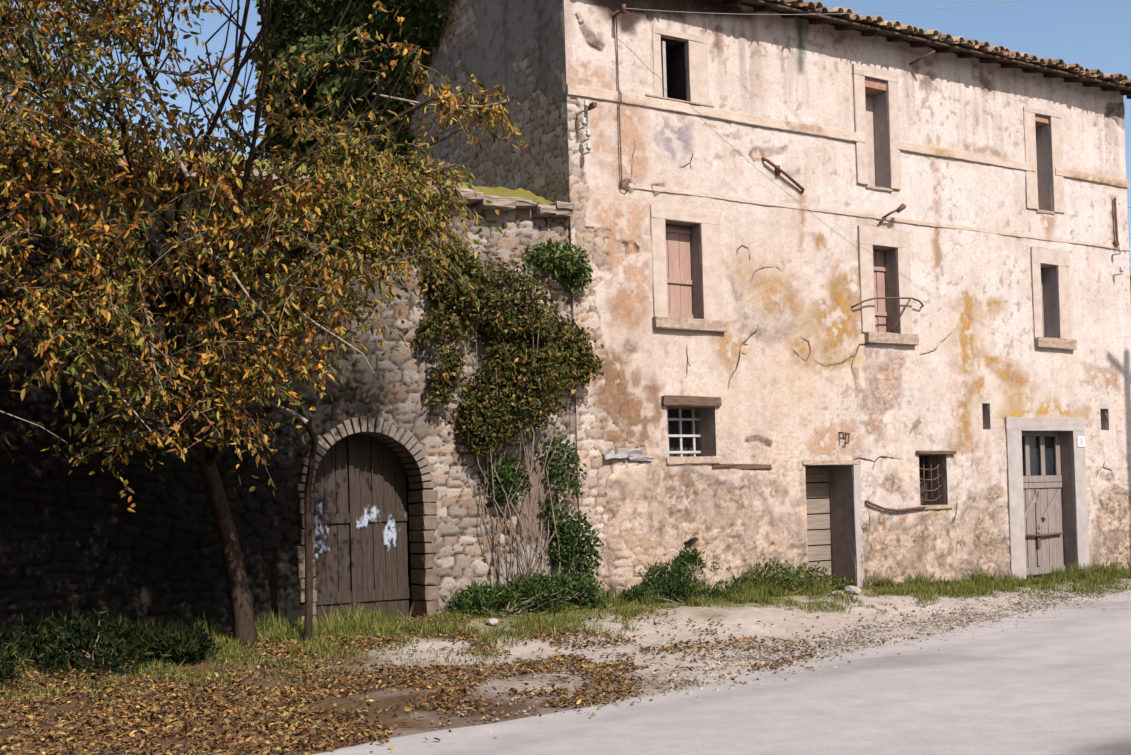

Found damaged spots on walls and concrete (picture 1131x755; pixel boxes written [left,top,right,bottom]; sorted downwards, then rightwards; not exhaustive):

crack [737,245,779,282]
flaking render [398,0,646,597]
damp [761,278,798,312]
damp [718,333,740,369]
crack [728,326,758,388]
crack [793,338,878,377]
damp [976,356,1026,391]
spalling [884,474,902,491]
spalling [860,484,1007,588]
flaking render [1095,473,1131,572]